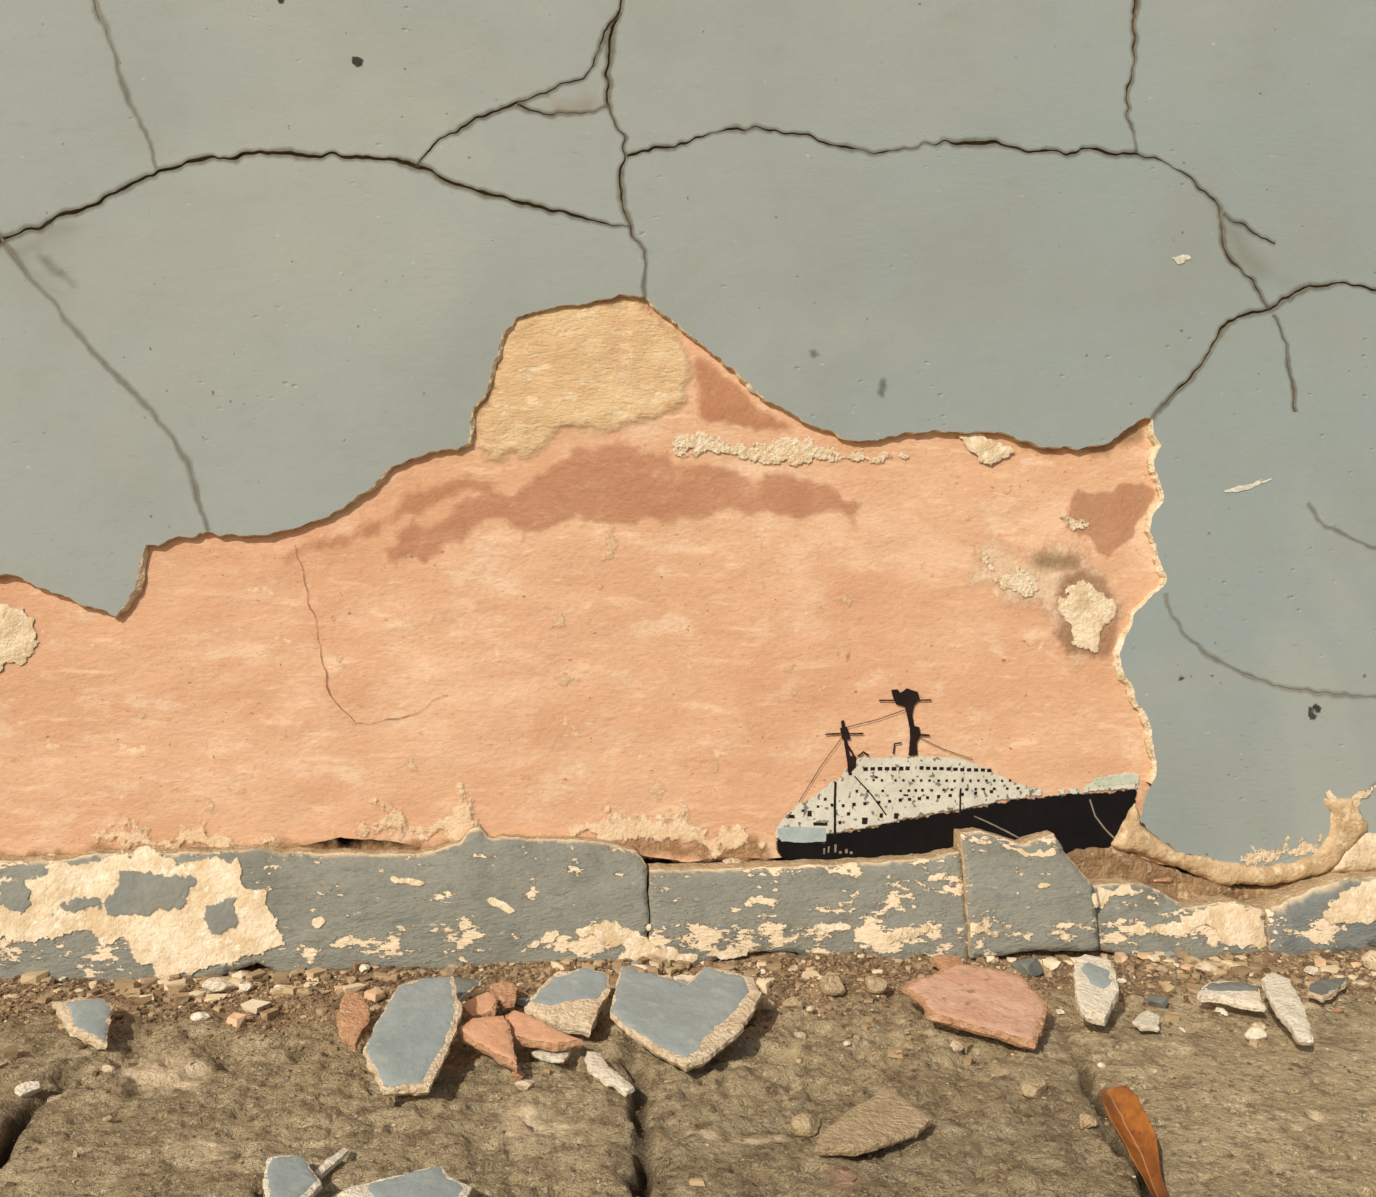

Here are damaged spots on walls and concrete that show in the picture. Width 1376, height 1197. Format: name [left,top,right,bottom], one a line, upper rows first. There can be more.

crack [0,0,1376,530]
crack [294,544,448,724]
peeling [0,294,1168,980]
crack [1165,593,1375,697]
crack [644,875,652,937]
peeling [1134,903,1266,950]
peeling [1322,879,1376,925]